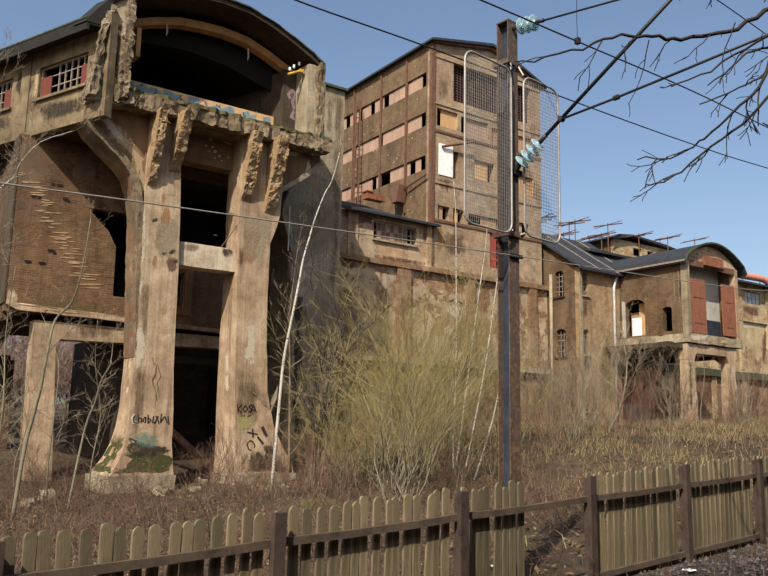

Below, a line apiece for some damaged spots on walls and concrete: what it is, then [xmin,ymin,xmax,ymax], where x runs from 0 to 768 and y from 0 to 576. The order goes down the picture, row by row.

spalling [18,172,103,289]
spalling [142,206,177,271]
peeling [128,280,148,371]